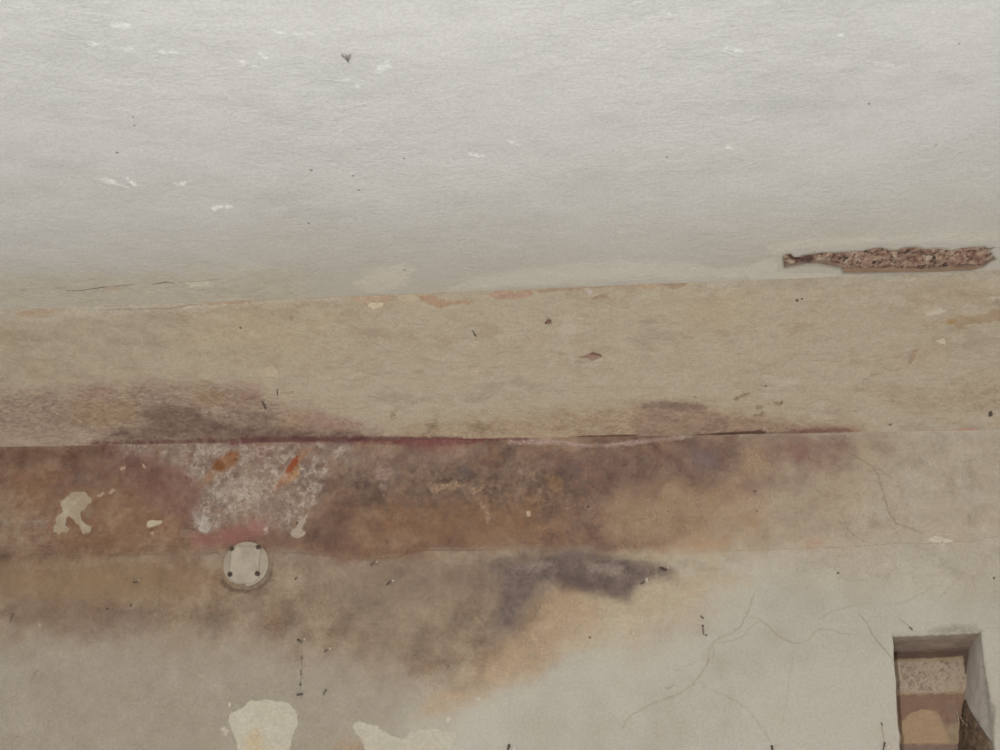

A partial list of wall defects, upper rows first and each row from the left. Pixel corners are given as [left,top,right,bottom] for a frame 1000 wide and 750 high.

flaking render [781,245,998,275]
peeling [53,489,115,534]
damp [0,407,1000,750]
peeling [221,699,298,750]
peeling [353,722,457,750]